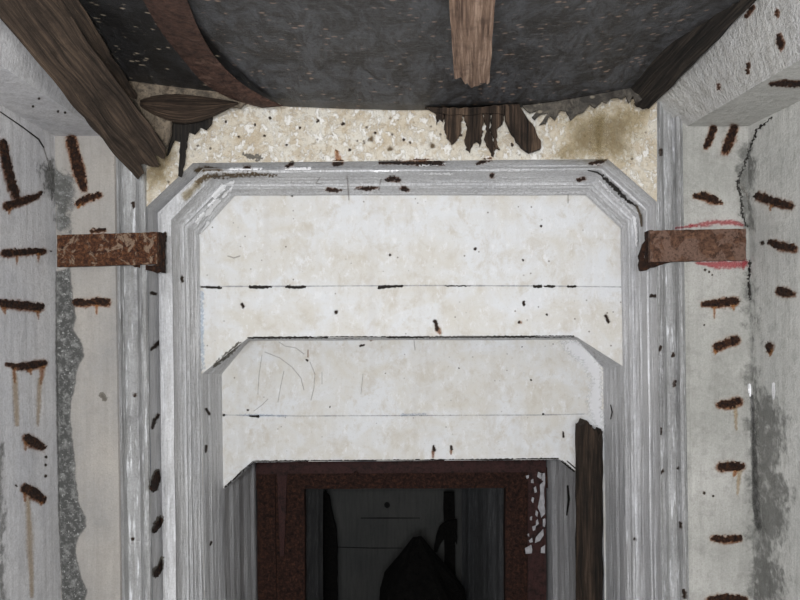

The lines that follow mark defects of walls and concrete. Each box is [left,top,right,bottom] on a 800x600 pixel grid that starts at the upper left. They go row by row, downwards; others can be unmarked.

water stain [561,110,643,157]
corrosion [703,124,738,155]
corrosion [0,139,43,214]
corrosion [65,135,102,208]
crack [735,117,772,227]
crack [745,260,753,300]
corrosion [0,299,45,319]
corrosion [701,297,740,319]
corrosion [5,360,48,384]
corrosion [716,461,745,476]
water stain [748,368,789,600]
peeling [525,472,546,554]